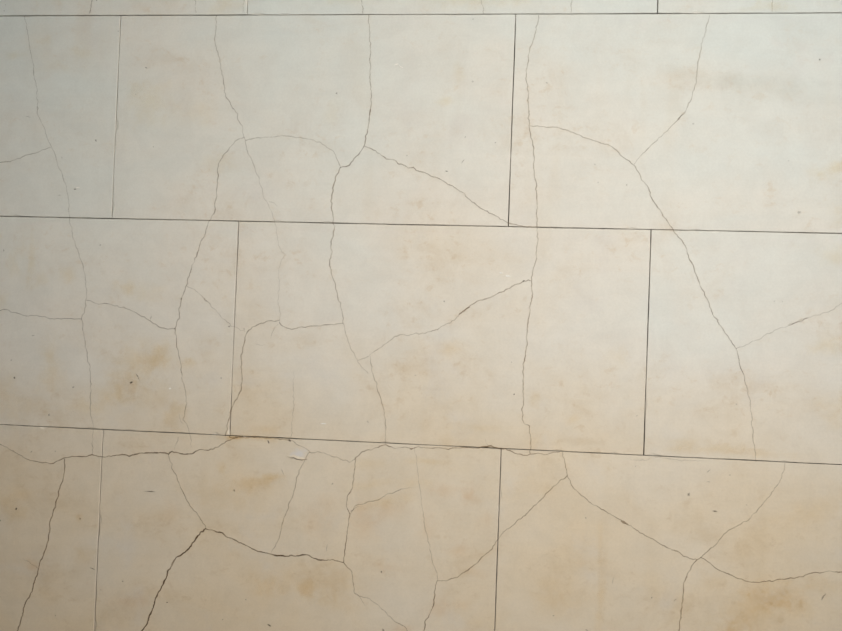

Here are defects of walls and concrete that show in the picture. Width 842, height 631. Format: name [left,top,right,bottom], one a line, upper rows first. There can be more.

crack [17,449,211,631]
crack [141,528,347,631]